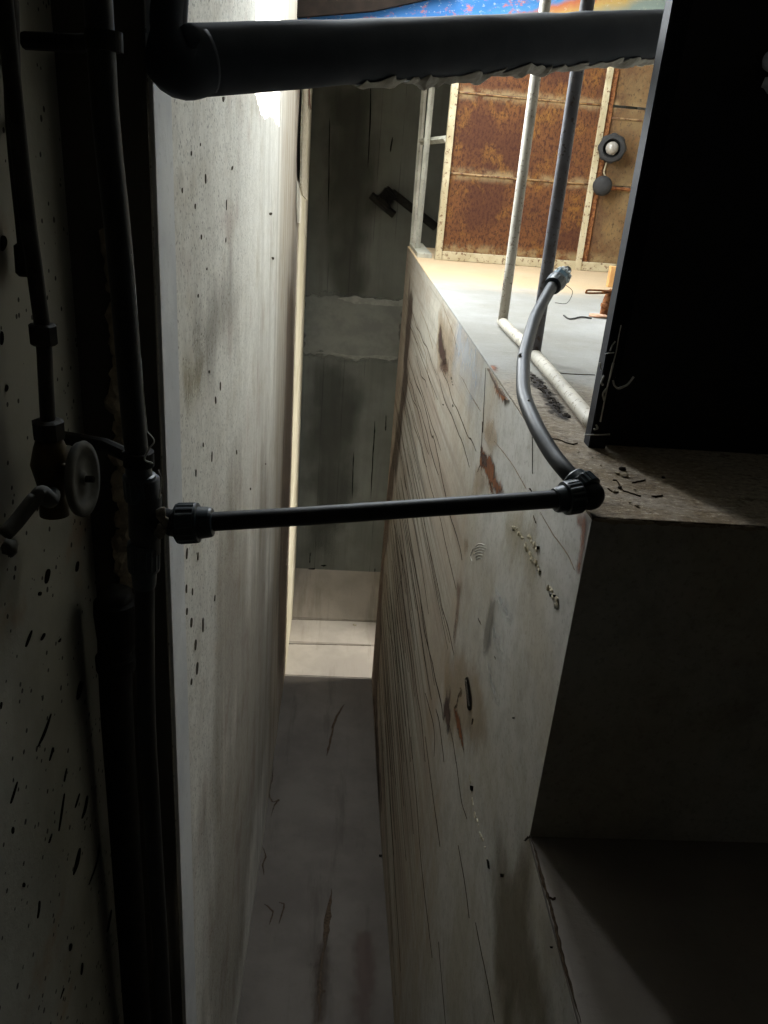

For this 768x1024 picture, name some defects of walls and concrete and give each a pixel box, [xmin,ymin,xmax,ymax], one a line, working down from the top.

corrosion [480,447,502,494]
crack [317,889,332,1021]